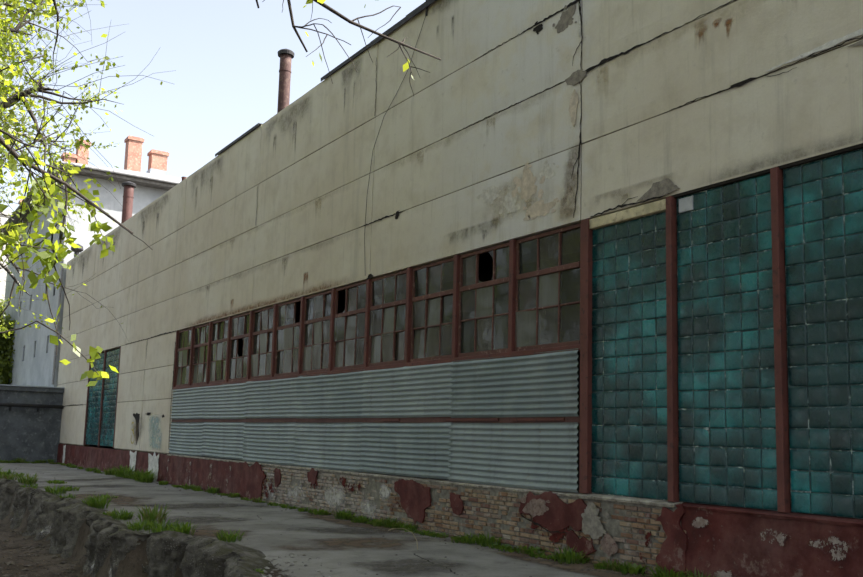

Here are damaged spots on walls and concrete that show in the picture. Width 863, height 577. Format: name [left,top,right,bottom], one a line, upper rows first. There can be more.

spalling [533,5,577,34]
crack [756,36,863,79]
spalling [565,69,587,86]
crack [451,0,736,218]
spalling [520,495,550,517]
spalling [581,501,618,562]
peeling [692,517,708,528]
peeling [760,529,787,547]
peeling [809,536,849,561]